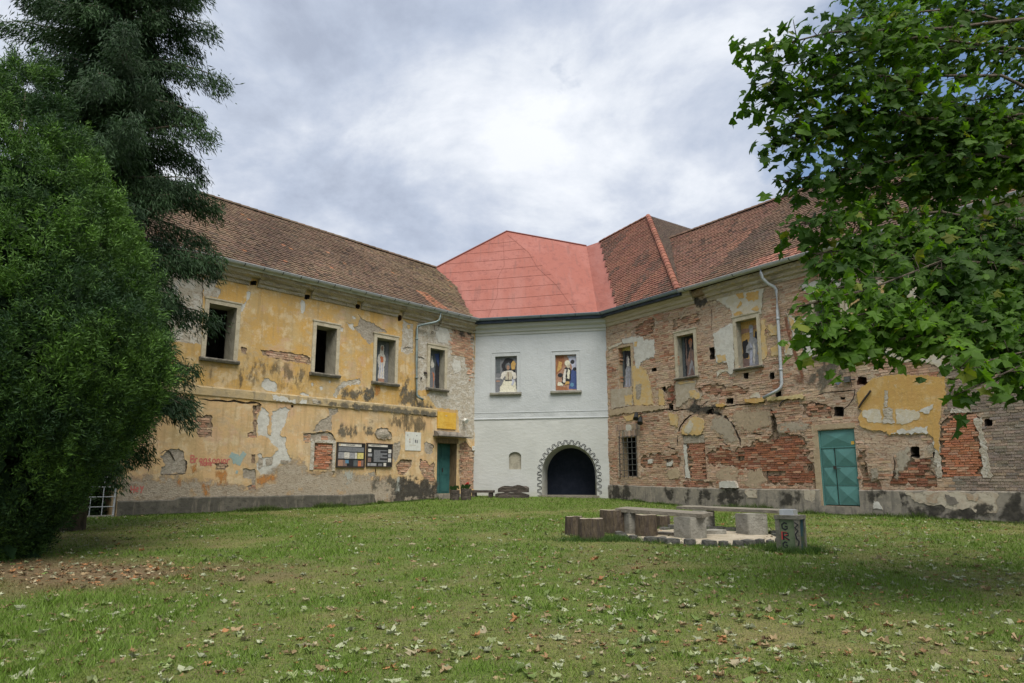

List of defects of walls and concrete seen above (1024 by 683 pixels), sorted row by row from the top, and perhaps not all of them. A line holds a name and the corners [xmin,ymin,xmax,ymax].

flaking render [261,350,311,365]
water stain [239,363,305,385]
crack [203,398,260,406]
flaking render [396,315,475,489]
flaking render [608,288,999,514]
flaking render [193,414,213,438]
peeling [243,378,361,490]
flaking render [160,449,188,475]
water stain [117,460,438,502]
water stain [665,487,744,506]
water stain [780,492,800,505]
water stain [899,490,1024,522]